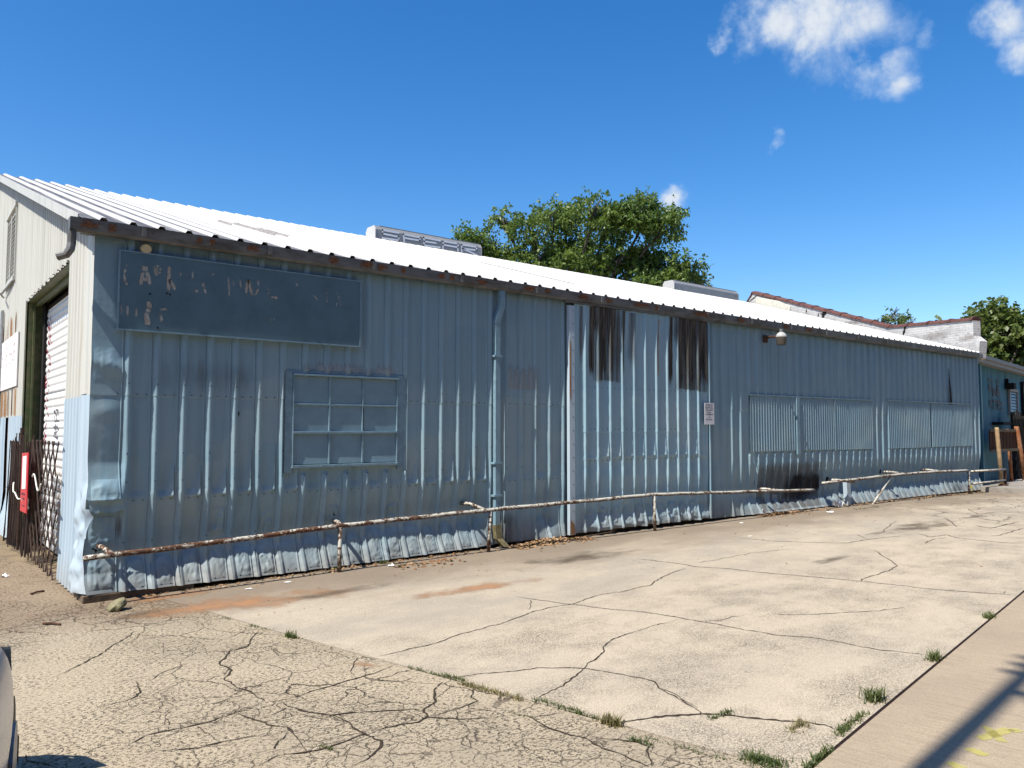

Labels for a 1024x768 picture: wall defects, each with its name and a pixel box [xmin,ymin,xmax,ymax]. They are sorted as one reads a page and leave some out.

rust [81,220,116,232]
water stain [580,306,635,382]
water stain [669,317,708,392]
water stain [792,475,820,489]
crack [58,631,134,675]
crack [120,509,1015,767]
crack [96,664,184,708]